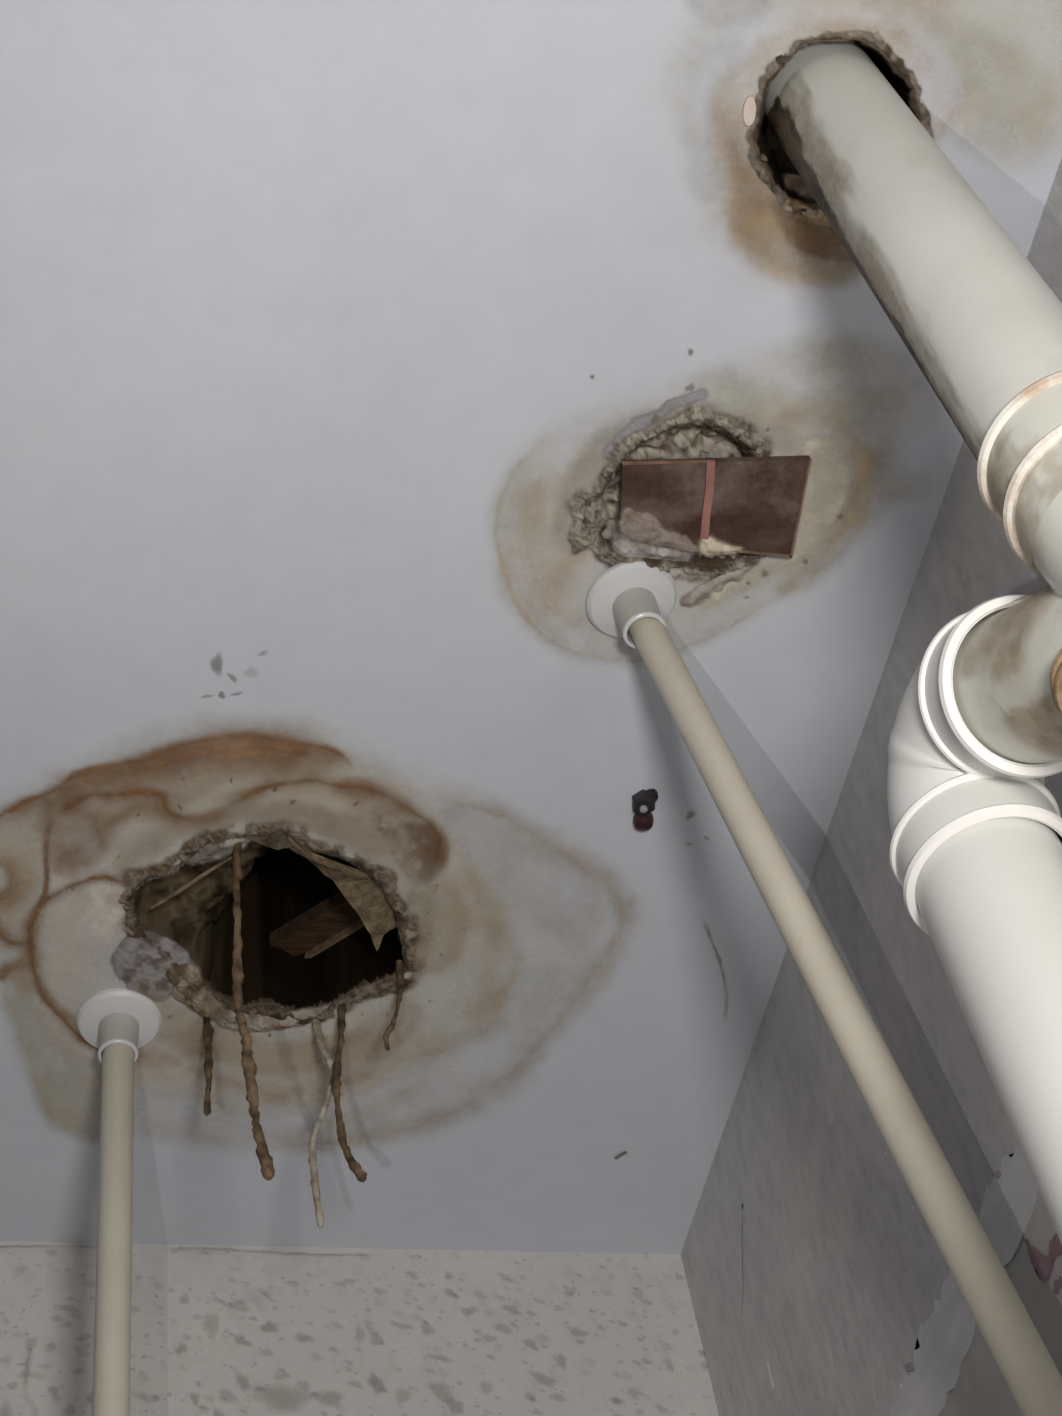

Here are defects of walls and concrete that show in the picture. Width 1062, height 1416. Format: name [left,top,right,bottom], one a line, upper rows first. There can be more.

leakage [735,166,853,276]
hole [742,31,933,232]
spalling [569,389,771,607]
leakage [706,571,767,618]
leakage [745,413,878,562]
corrosion [0,734,478,1055]
hole [112,820,422,1033]
corrosion [134,996,382,1108]